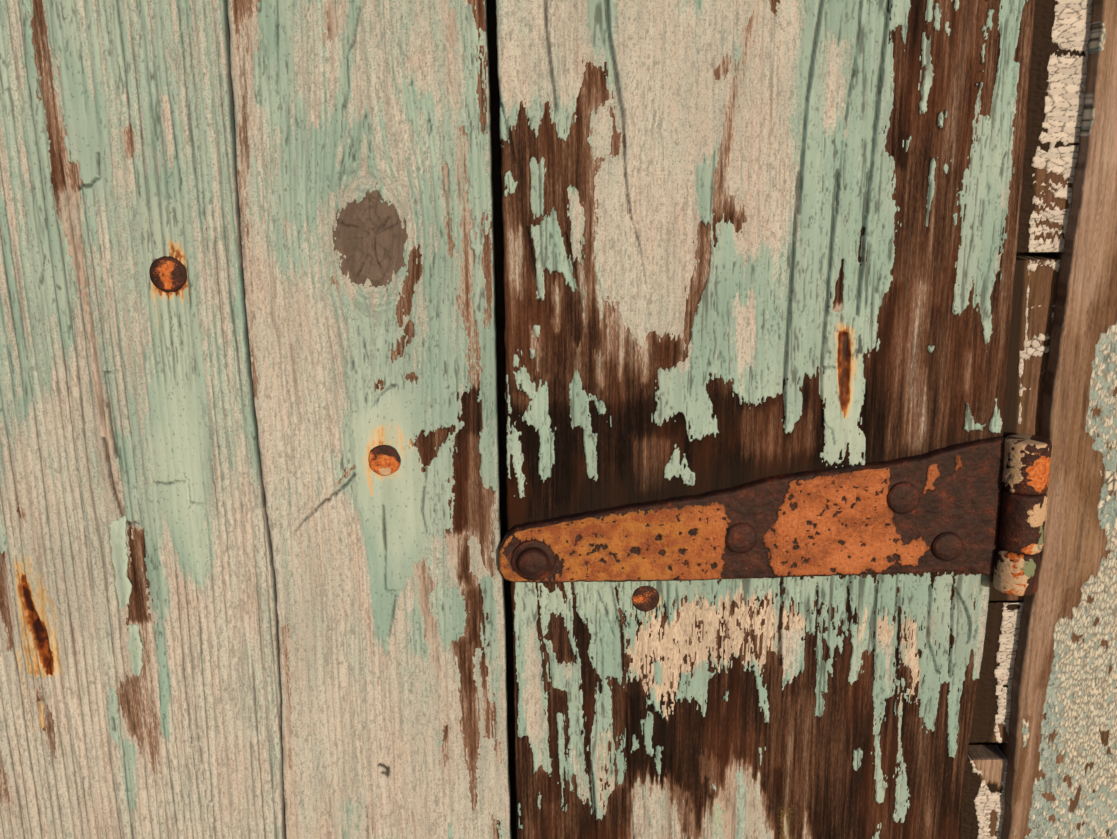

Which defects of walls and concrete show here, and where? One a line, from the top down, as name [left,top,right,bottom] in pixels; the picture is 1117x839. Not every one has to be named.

rust [148,237,193,323]
rust [362,417,416,498]
peeling [391,244,424,364]
peeling [413,0,979,839]
rust [833,319,862,420]
peeling [858,0,1035,453]
peeling [996,0,1117,839]
rust [12,545,67,736]